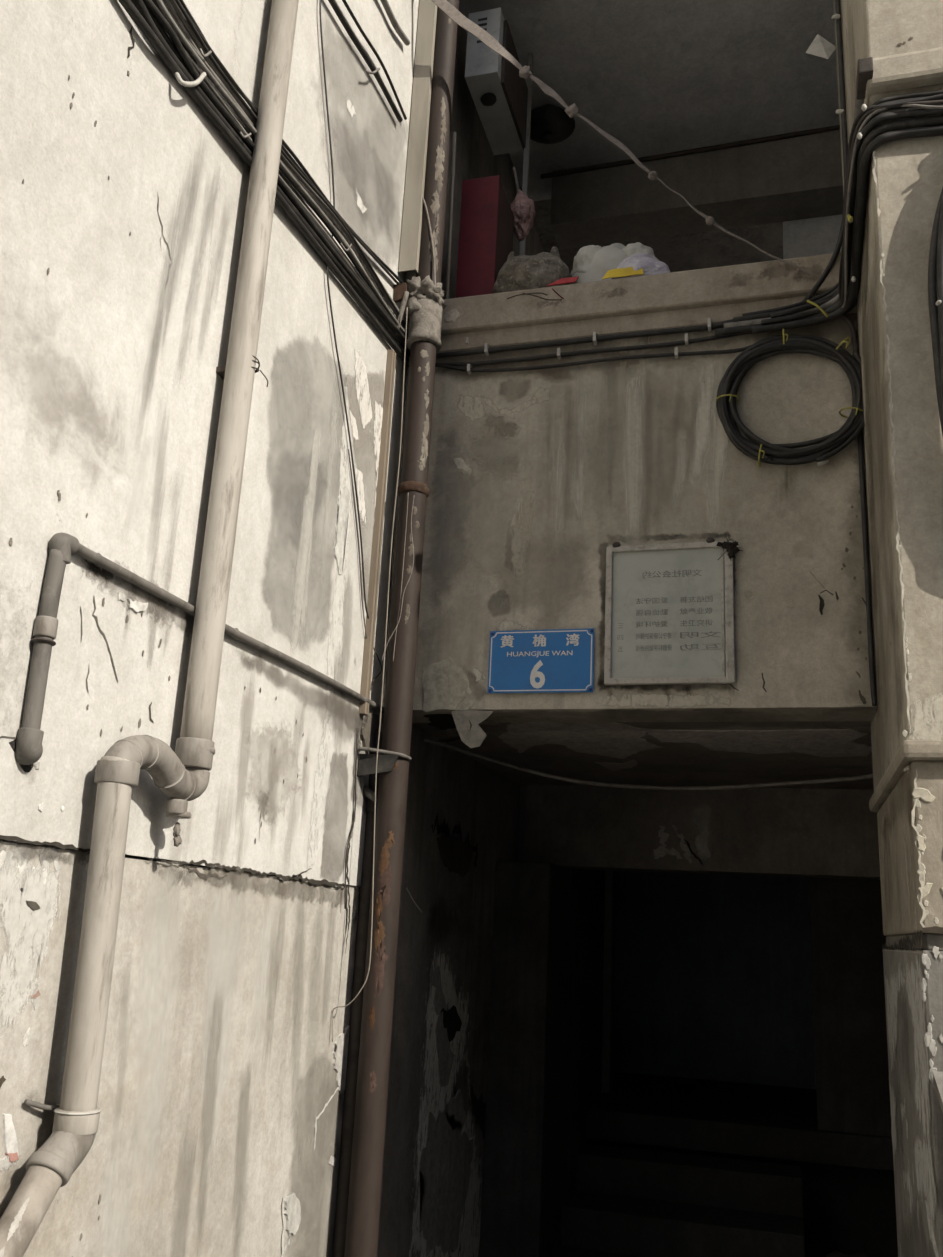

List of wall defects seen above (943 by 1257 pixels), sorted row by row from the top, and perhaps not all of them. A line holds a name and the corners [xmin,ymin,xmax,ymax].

water stain [264,347,348,646]
water stain [627,389,641,530]
water stain [678,374,727,516]
crack [80,596,118,693]
water stain [321,808,344,881]
water stain [330,755,348,801]
flaking render [422,658,872,771]
flaking render [903,766,943,928]
rust [368,830,395,1030]
flaking render [0,1114,19,1170]
water stain [295,1082,341,1257]
flaking render [409,949,486,1257]